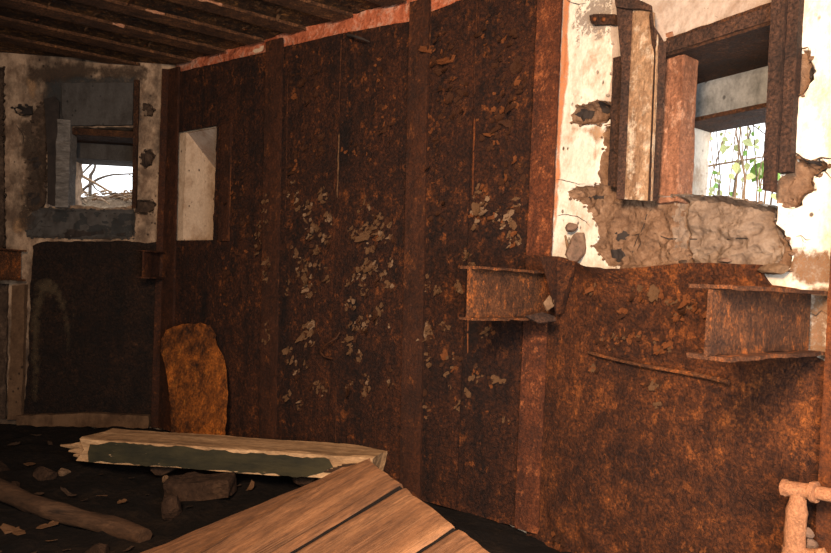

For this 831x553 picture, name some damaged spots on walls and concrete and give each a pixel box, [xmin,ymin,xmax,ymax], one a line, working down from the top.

corrosion [474,11,527,151]
spalling [568,0,831,272]
corrosion [282,319,316,381]
corrosion [283,179,333,298]
corrosion [341,195,396,363]
corrosion [416,321,506,412]
corrosion [468,155,527,248]
corrosion [595,284,708,351]
corrosion [652,334,674,355]